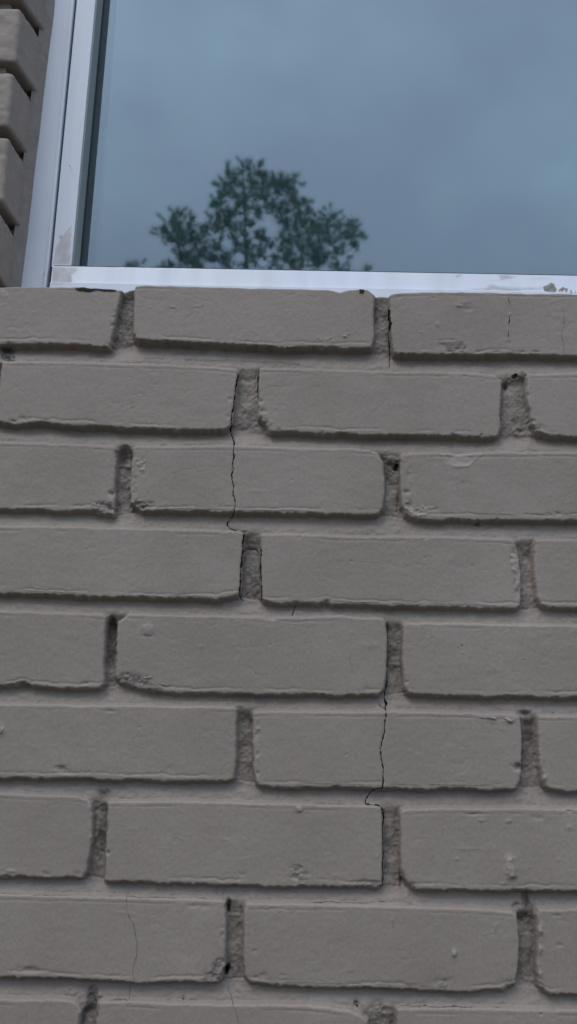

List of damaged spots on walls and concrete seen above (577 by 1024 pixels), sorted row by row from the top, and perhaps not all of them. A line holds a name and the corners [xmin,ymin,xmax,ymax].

crack [226,372,296,601]
crack [297,624,496,905]